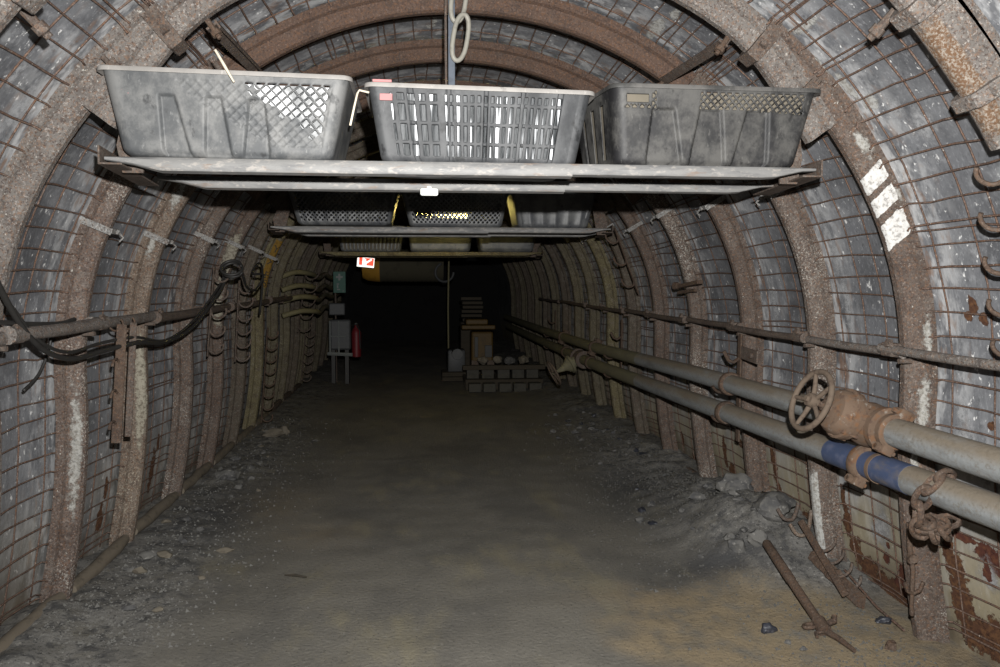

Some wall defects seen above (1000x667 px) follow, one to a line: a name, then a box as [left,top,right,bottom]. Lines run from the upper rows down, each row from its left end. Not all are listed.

rust [964,296,989,328]
leakage [68,393,84,516]
rust [840,484,909,607]
rust [942,532,1000,663]